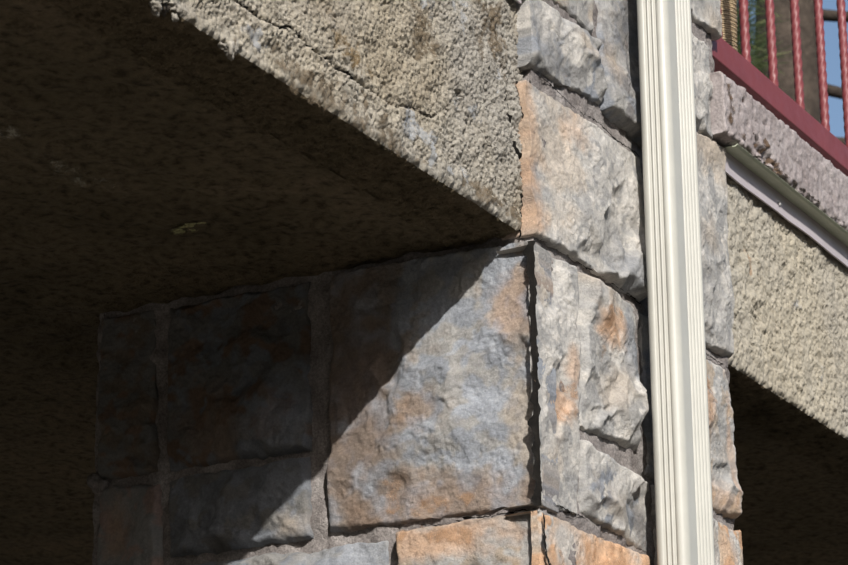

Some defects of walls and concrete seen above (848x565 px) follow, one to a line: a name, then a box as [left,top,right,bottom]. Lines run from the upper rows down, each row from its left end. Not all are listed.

crack [233,0,373,92]
crack [388,104,447,118]
crack [537,71,639,157]
crack [422,77,587,565]